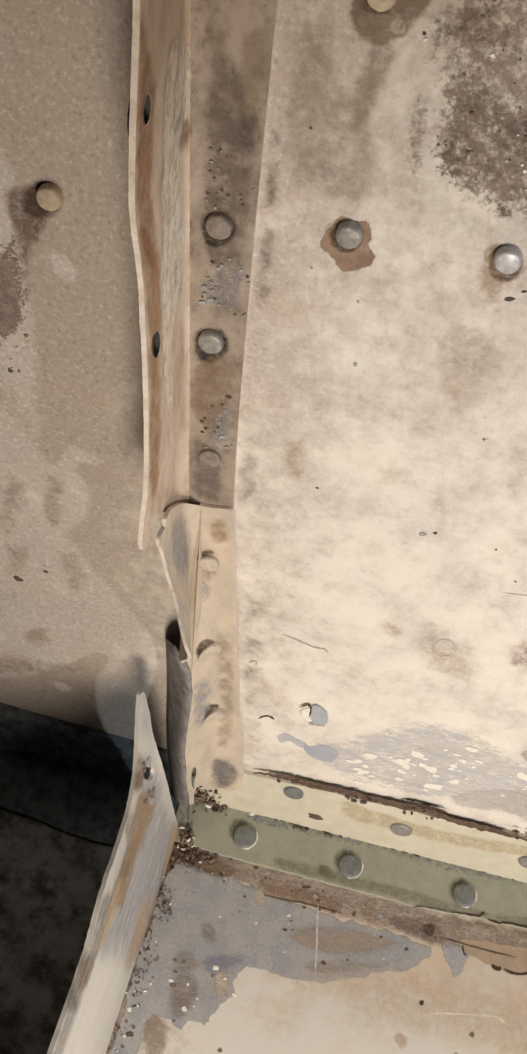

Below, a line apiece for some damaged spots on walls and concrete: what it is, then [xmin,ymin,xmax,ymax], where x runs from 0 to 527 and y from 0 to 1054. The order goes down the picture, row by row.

peeling [109,861,527,1054]